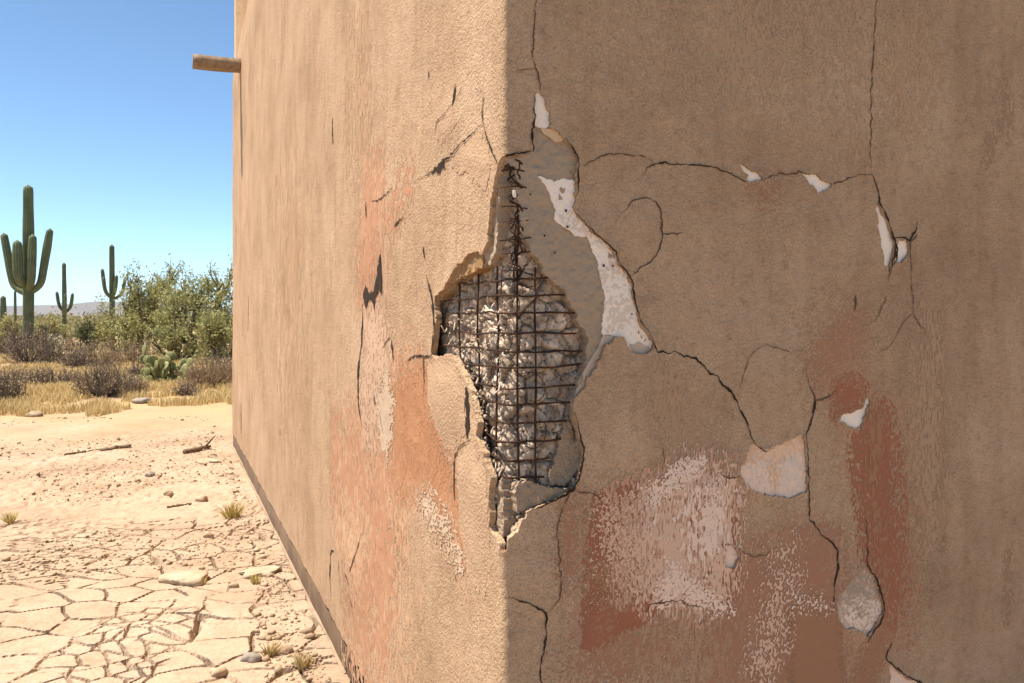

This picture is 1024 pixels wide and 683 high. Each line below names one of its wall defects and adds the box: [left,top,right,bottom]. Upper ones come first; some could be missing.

spalling [741,164,762,182]
spalling [803,174,830,193]
crack [834,0,929,352]
spalling [876,203,908,271]
crack [357,249,434,431]
crack [505,413,602,683]
crack [566,139,840,609]
rust [536,369,914,683]
leakage [583,343,881,683]
spalling [740,435,807,498]
spalling [839,398,869,428]
crack [866,521,922,683]